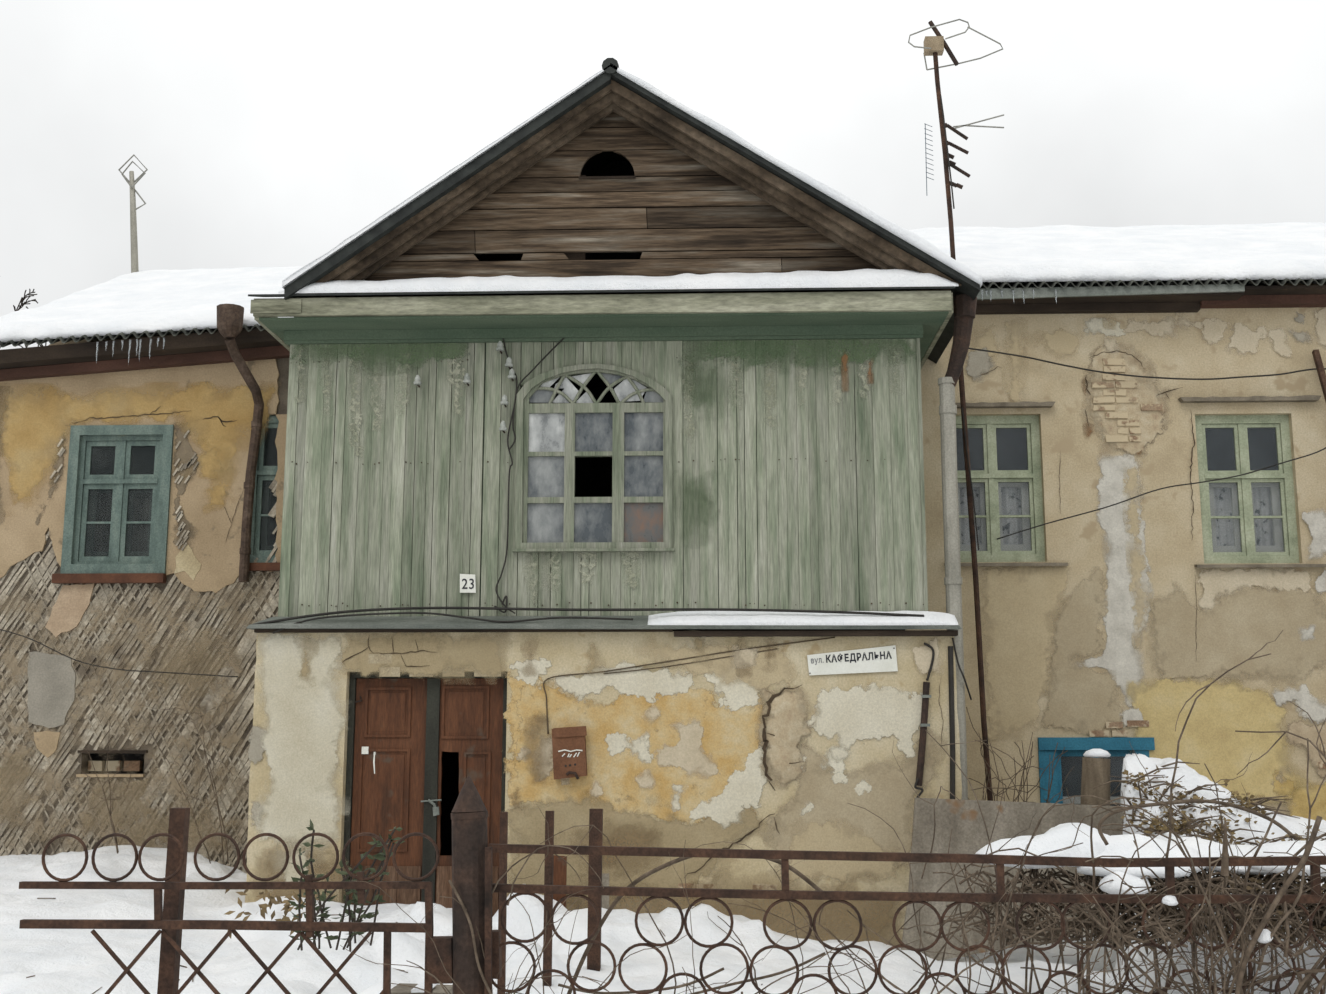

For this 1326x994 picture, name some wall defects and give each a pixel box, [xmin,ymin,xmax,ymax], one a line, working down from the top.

peeling [1,381,275,551]
spalling [1085,307,1326,455]
crack [341,637,430,667]
peeling [912,637,941,674]
leakage [1078,454,1152,707]
peeling [1151,510,1326,821]
peeling [368,646,938,890]
crack [684,685,804,878]